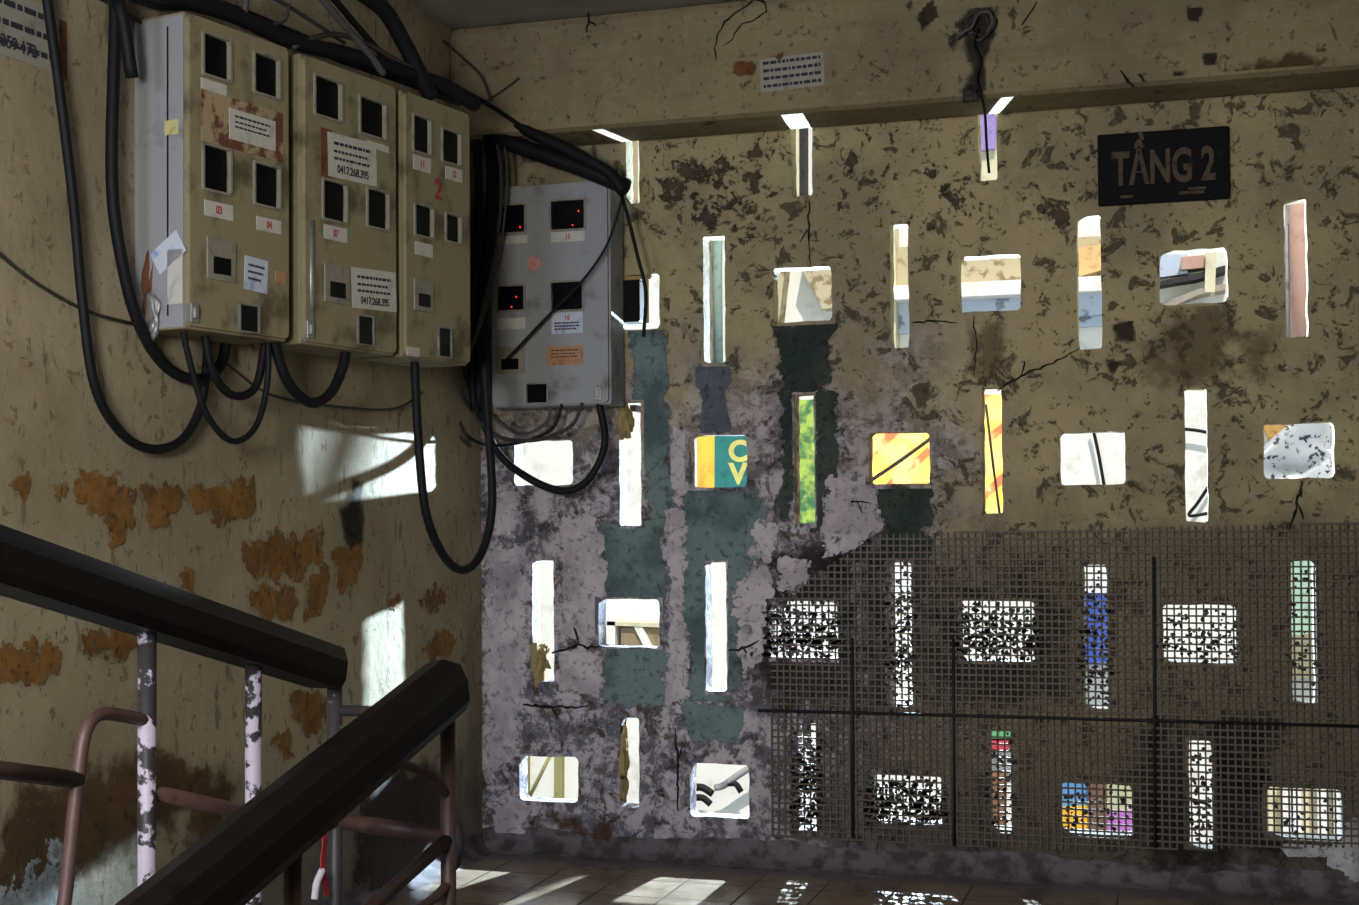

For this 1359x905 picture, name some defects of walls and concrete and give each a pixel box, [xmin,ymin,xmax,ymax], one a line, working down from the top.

peeling [8,471,31,502]
peeling [53,468,257,552]
peeling [241,480,365,623]
peeling [555,330,885,745]
peeling [0,628,137,687]
flaking render [482,488,529,780]
flaking render [491,797,531,834]